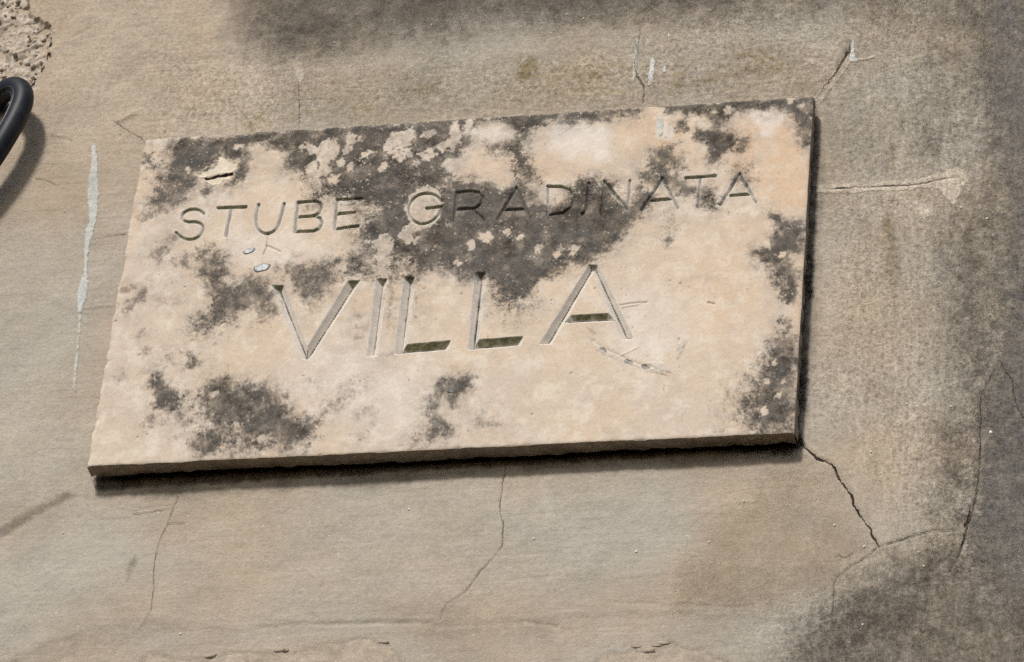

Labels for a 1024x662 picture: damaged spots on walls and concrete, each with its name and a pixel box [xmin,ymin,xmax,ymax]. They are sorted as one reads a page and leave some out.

crack [817,44,850,97]
crack [816,177,955,189]
water stain [812,0,1024,662]
crack [132,495,183,629]
water stain [95,447,698,489]
crack [441,462,506,614]
water stain [719,436,803,453]
crack [798,360,1024,619]